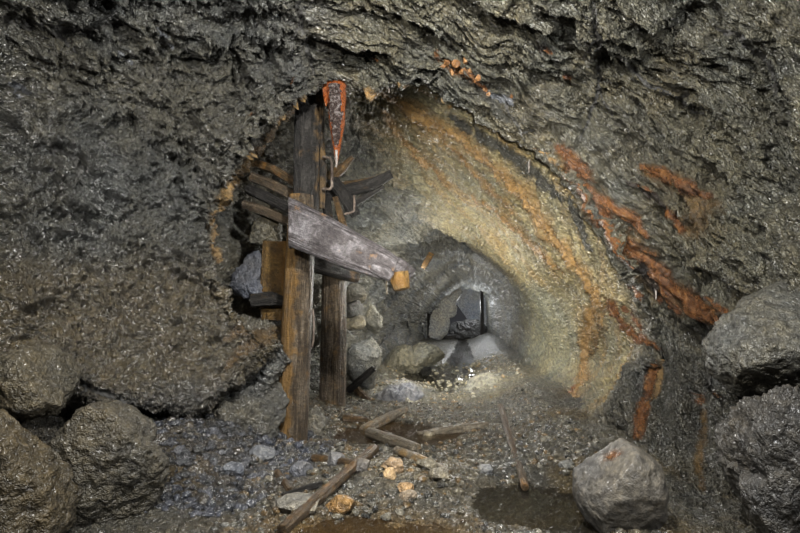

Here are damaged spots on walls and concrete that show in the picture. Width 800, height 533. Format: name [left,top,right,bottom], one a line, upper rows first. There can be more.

rust [364,83,665,440]
rust [533,143,728,325]